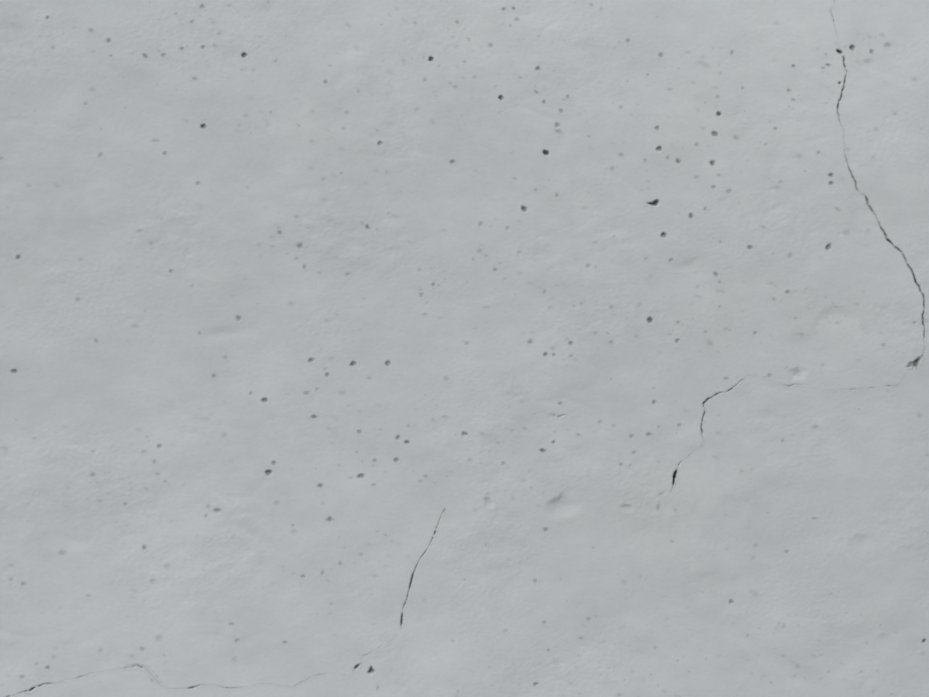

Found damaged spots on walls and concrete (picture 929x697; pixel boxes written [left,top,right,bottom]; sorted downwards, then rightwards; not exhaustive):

crack [668,0,926,495]
crack [352,508,446,672]
crack [3,663,325,697]